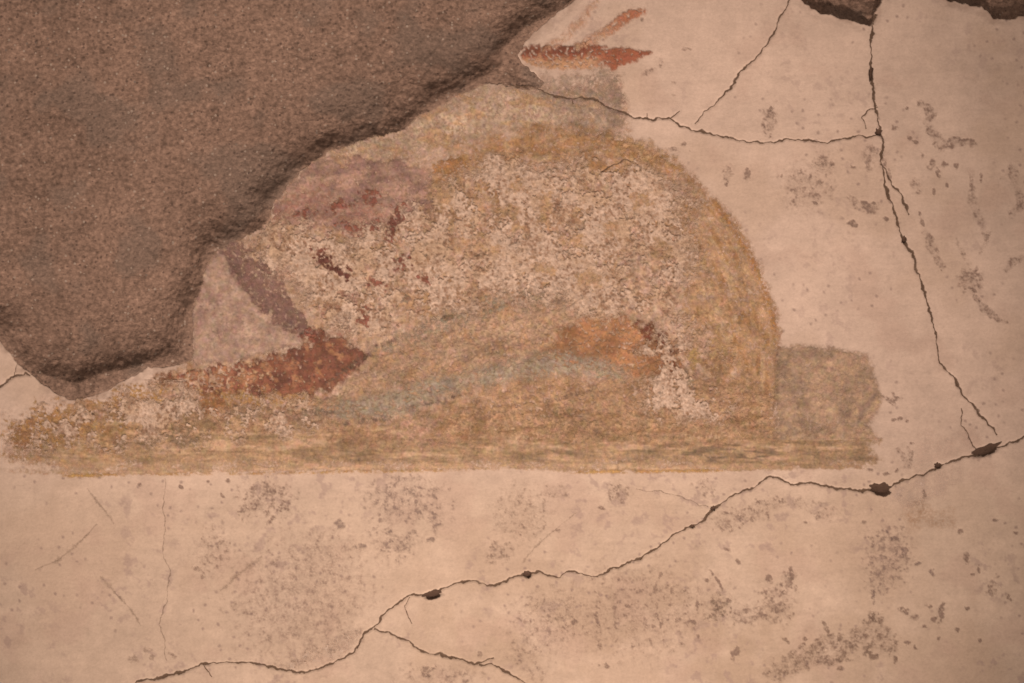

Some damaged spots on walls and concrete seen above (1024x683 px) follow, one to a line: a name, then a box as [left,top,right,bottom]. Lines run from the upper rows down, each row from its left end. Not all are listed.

spalling [802,0,881,26]
spalling [947,0,1024,19]
spalling [0,0,737,455]
crack [516,0,997,435]
crack [136,409,1024,682]